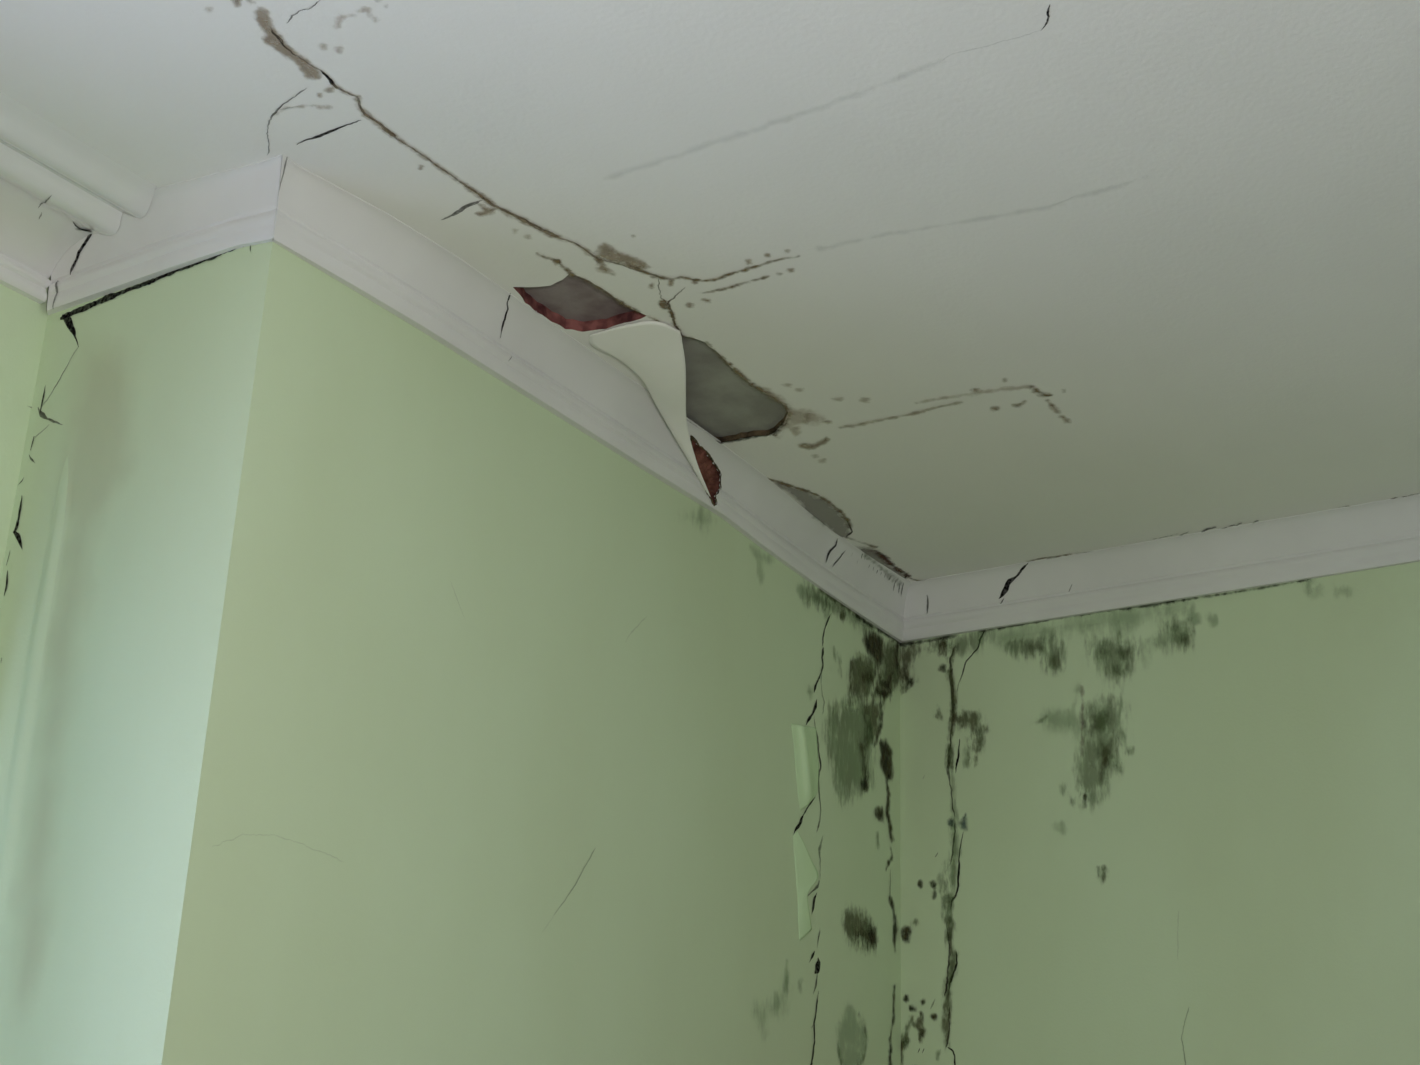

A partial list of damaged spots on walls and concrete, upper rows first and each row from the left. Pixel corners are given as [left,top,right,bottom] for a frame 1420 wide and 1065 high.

crack [266,0,683,336]
crack [4,196,92,595]
flaking render [589,321,722,506]
peeling [769,479,853,537]
crack [794,614,831,833]
damp [820,589,954,866]
damp [938,712,983,760]
crack [942,563,1028,1065]
crack [808,881,820,1065]
damp [845,911,876,948]
damp [889,896,911,946]
damp [889,986,937,1065]